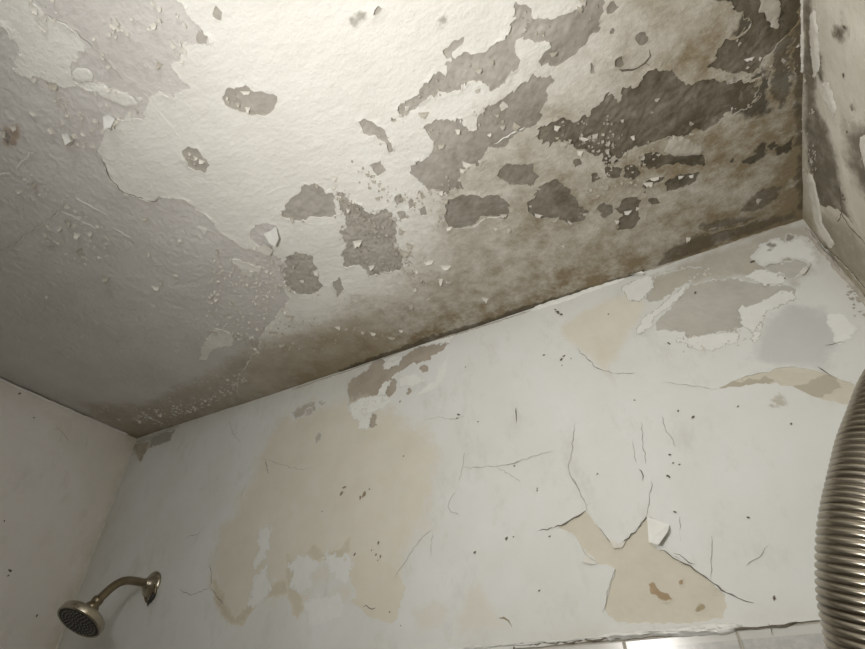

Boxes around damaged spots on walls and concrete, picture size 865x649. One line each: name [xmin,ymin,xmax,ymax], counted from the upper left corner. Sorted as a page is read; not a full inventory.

peeling [280,0,865,317]
peeling [0,0,404,464]
damp [37,0,865,510]
peeling [292,260,811,430]
peeling [720,369,855,405]
damp [204,391,513,644]
crack [448,452,548,514]
crack [539,425,587,531]
crack [600,422,652,544]
peeling [559,511,742,641]
crack [660,519,754,603]
crack [733,622,801,632]